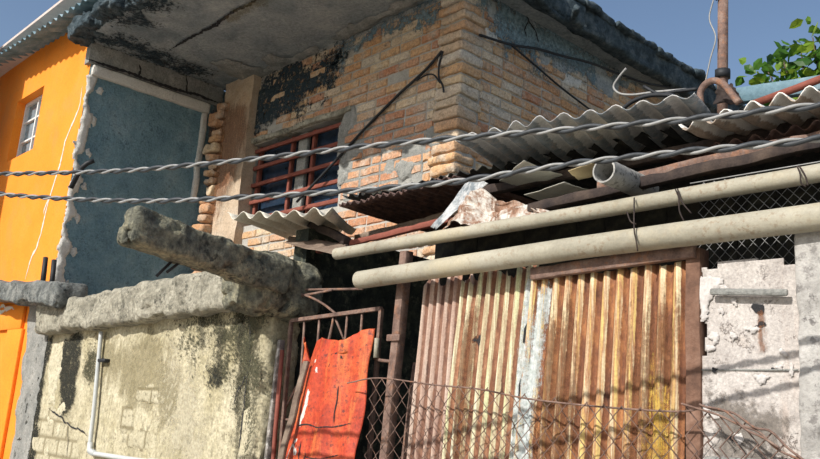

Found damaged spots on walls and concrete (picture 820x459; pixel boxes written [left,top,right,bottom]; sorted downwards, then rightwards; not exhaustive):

crack [171,0,257,49]
crack [25,91,82,278]
flaking render [55,74,104,283]
spalling [191,103,230,233]
crack [0,304,14,315]
water stain [13,336,53,459]
crack [49,408,87,447]
water stain [58,333,98,417]
water stain [203,321,225,396]
water stain [231,313,252,458]
rust [532,295,577,459]
rust [622,290,685,459]